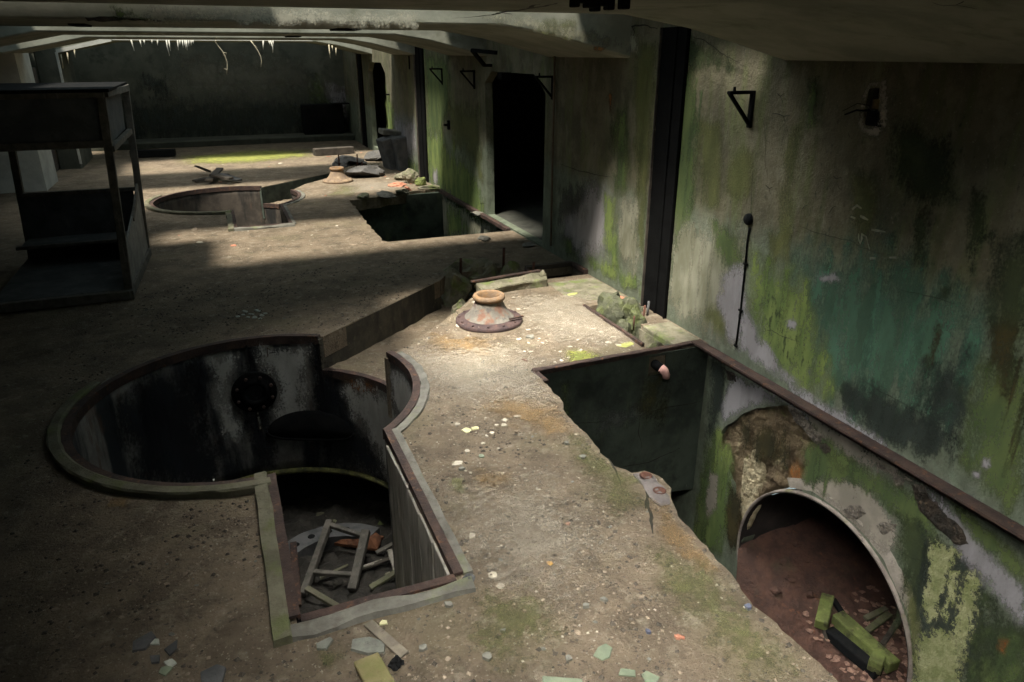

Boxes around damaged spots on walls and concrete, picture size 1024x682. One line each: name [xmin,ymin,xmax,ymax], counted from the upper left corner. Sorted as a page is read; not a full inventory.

water stain [617,182,640,278]
water stain [668,78,746,349]
water stain [110,360,227,483]
water stain [304,343,388,484]
spalling [543,328,708,492]
flaking render [705,473,718,517]
water stain [707,358,767,553]
corrosion [741,419,802,479]
flaking render [721,369,831,454]
water stain [789,309,1024,497]
flaking render [877,463,1024,624]